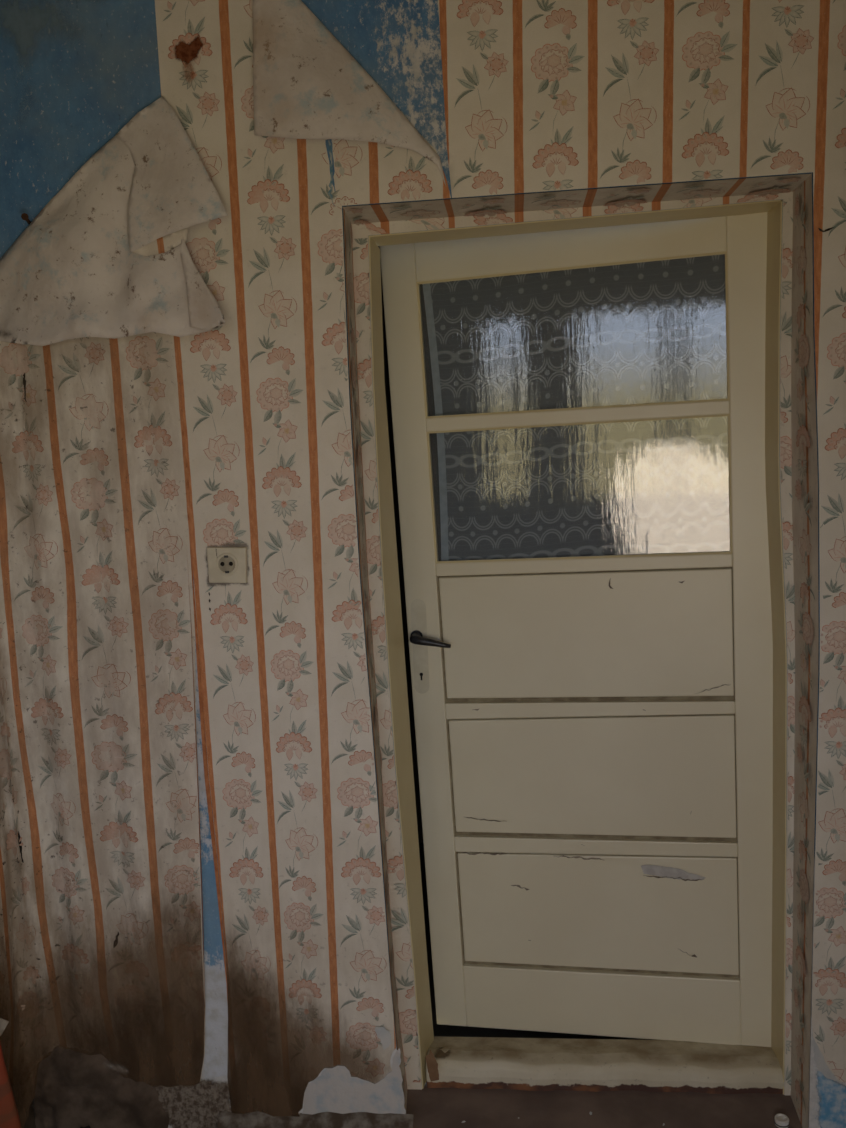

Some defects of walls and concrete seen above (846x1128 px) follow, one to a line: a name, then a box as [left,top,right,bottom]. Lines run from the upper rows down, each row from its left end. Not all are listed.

corrosion [175,36,203,80]
leakage [0,903,378,1128]
spalling [217,1027,413,1128]